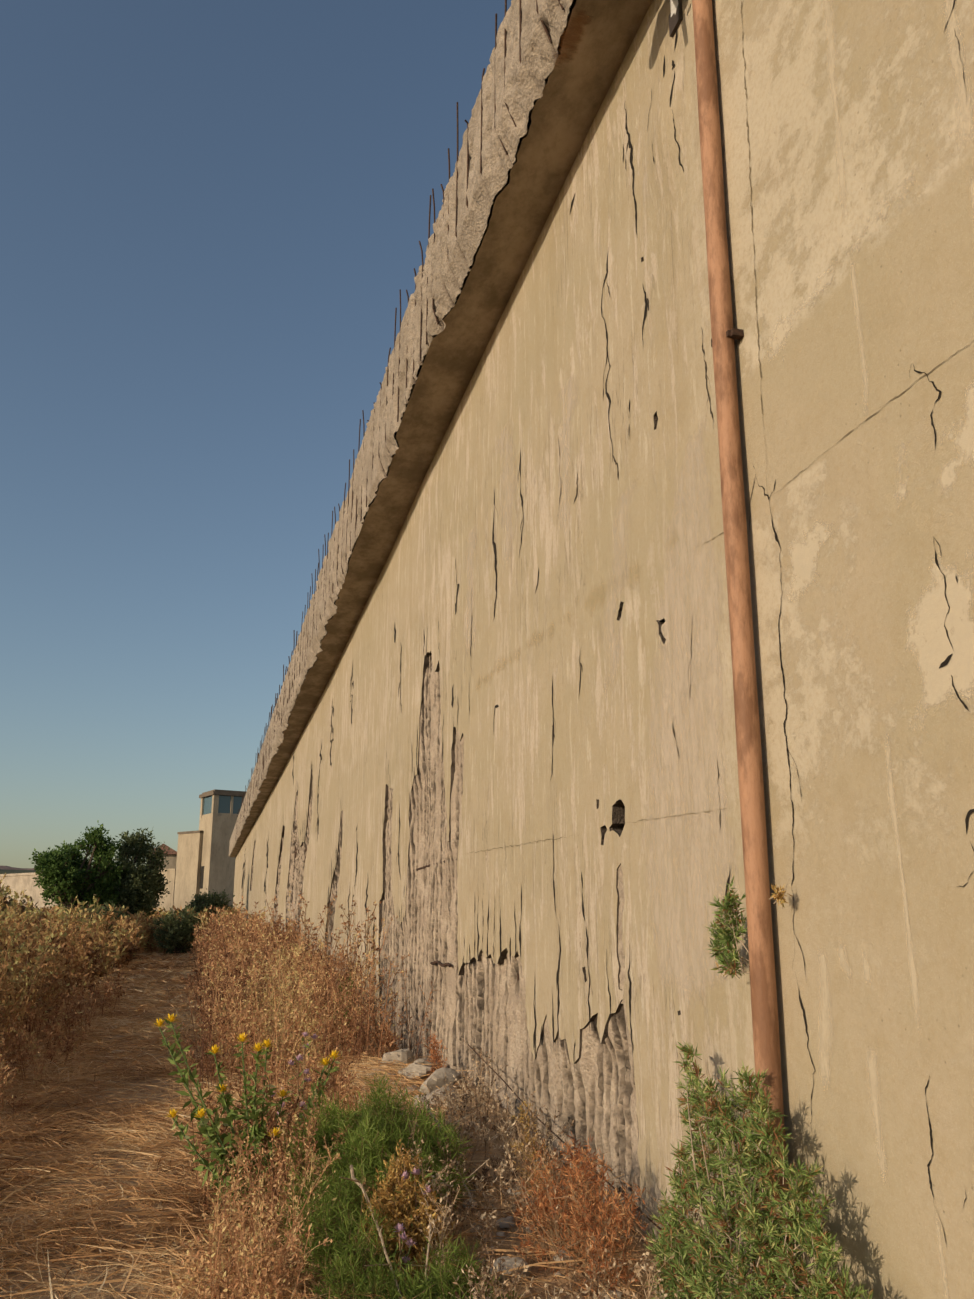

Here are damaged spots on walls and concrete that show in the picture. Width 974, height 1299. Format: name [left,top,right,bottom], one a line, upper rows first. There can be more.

crack [623,29,684,234]
crack [601,254,630,477]
crack [641,287,649,340]
crack [685,0,974,1132]
spalling [380,622,642,1223]
crack [925,1076,966,1242]